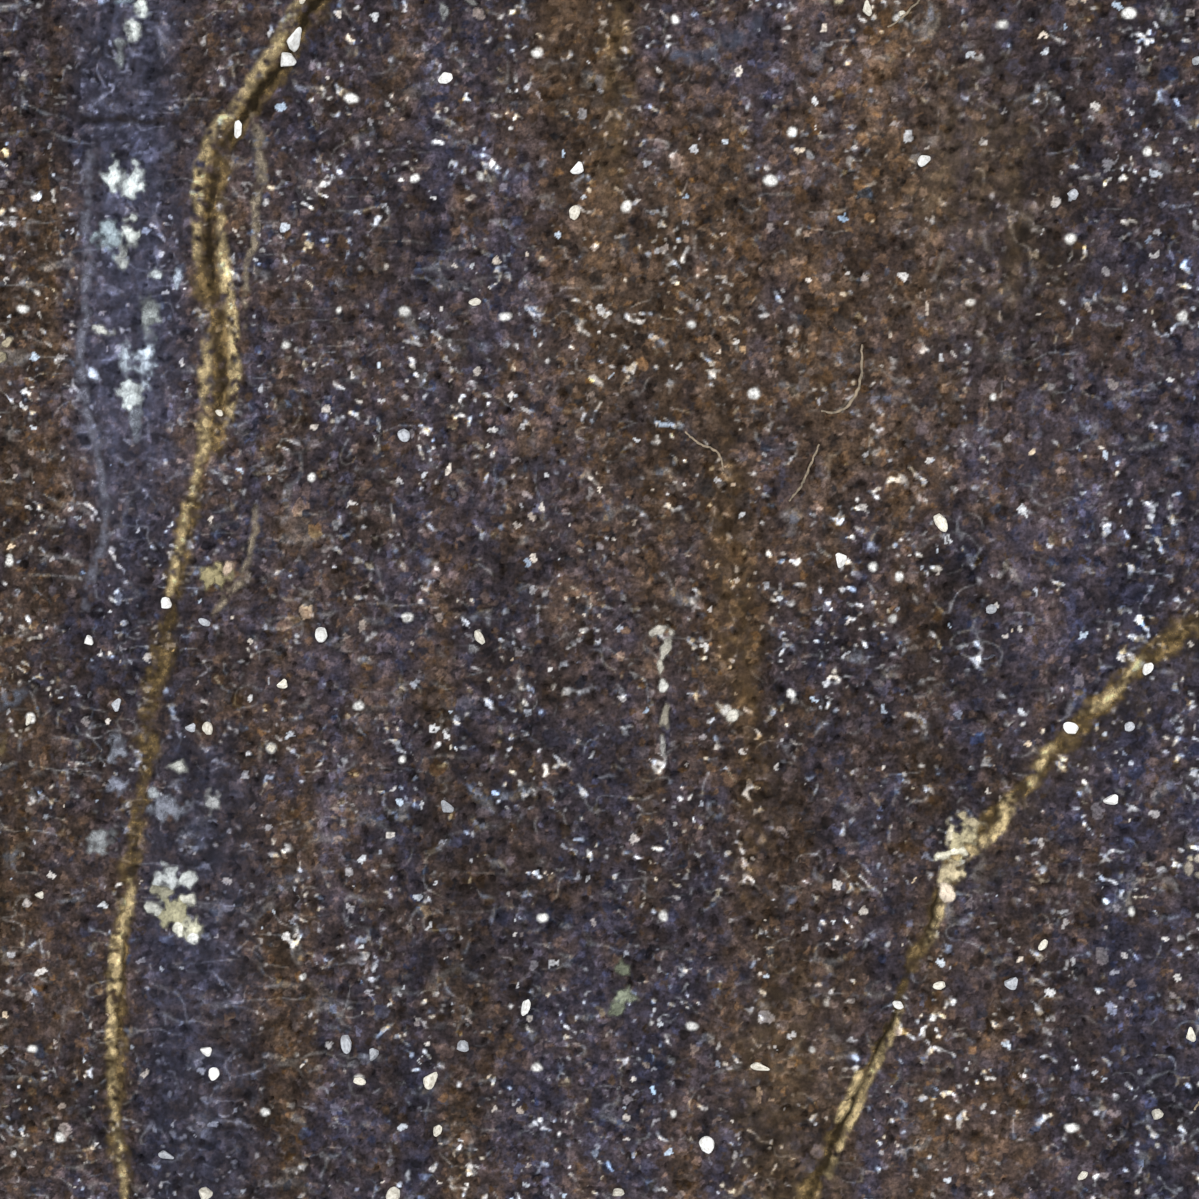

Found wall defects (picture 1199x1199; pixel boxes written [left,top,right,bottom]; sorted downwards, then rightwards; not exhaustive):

leakage [77,0,181,579]
crack [106,0,327,1199]
leakage [107,735,126,762]
leakage [107,777,126,790]
leakage [170,761,185,772]
leakage [147,787,184,821]
leakage [87,831,114,853]
leakage [187,784,226,879]
crack [796,613,1199,1199]
leakage [191,1049,230,1075]